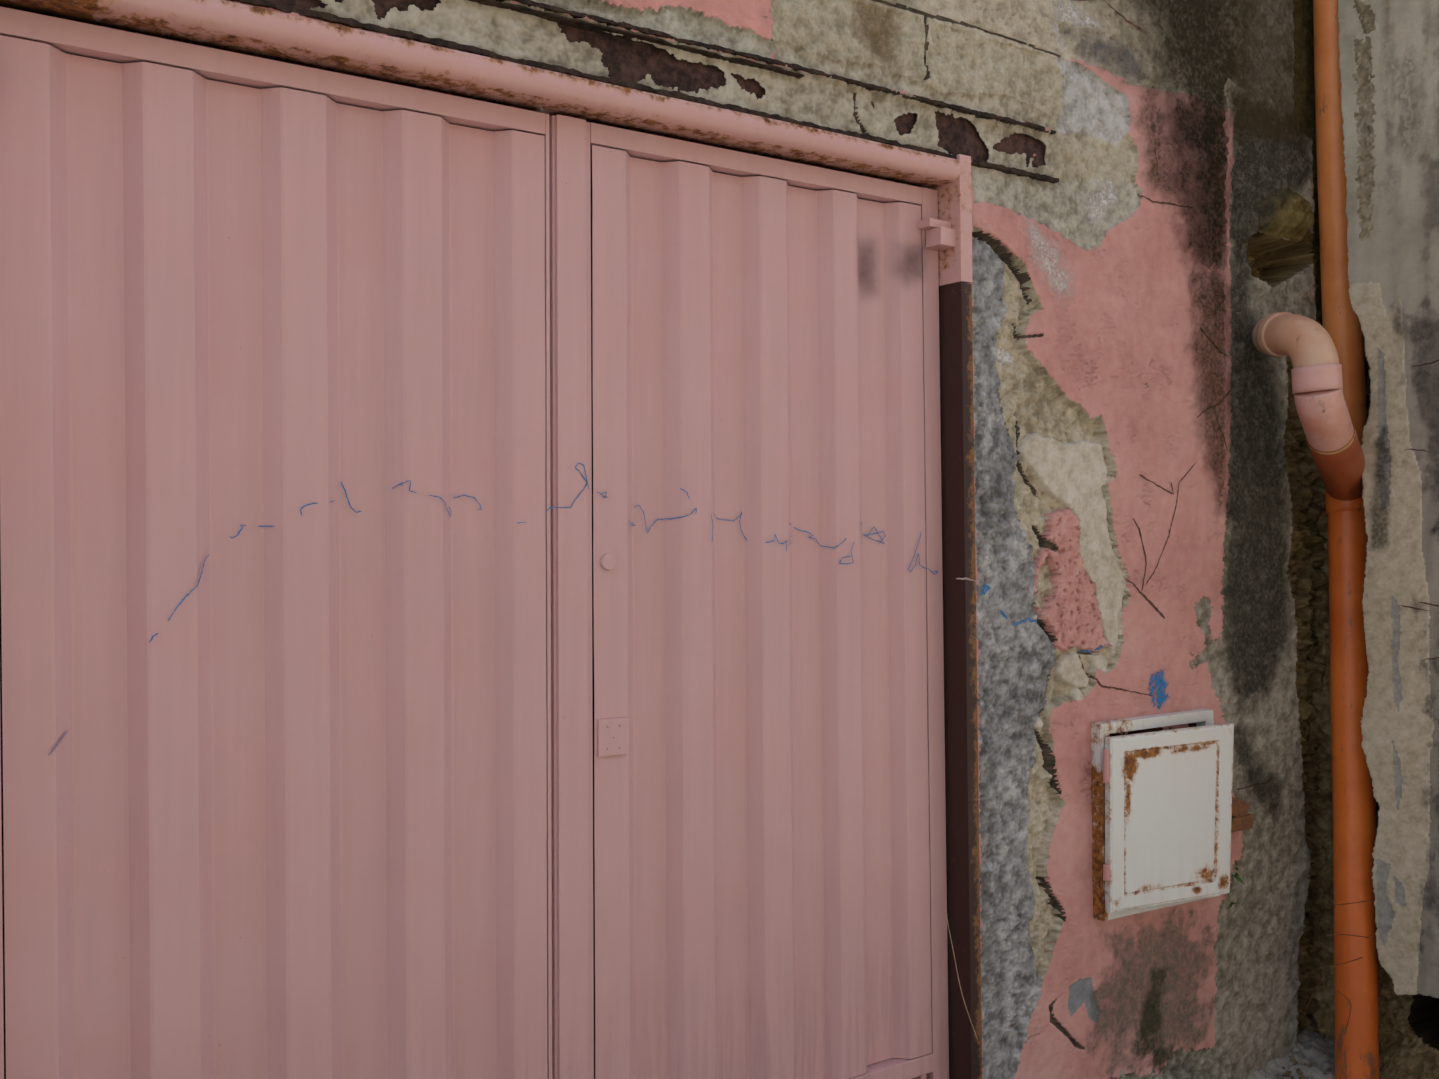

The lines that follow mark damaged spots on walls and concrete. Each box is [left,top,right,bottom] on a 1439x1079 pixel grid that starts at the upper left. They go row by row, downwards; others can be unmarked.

spalling [532,0,1245,251]
water stain [1143,0,1312,701]
spalling [1364,337,1372,420]
spalling [993,251,1131,980]
crack [1127,391,1230,619]
peeling [1068,977,1101,1023]
peeling [1111,1042,1236,1079]
spalling [1378,954,1439,1079]